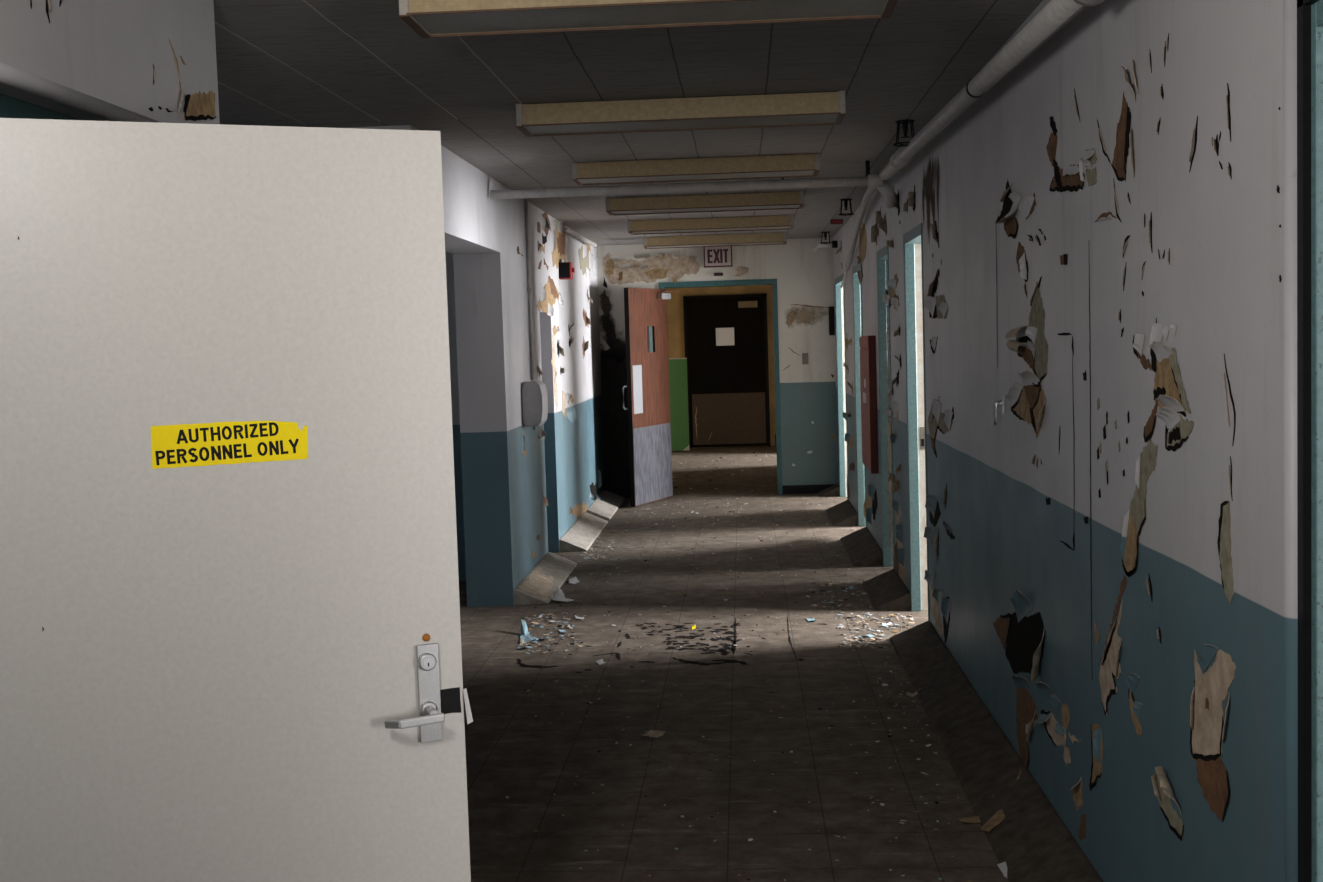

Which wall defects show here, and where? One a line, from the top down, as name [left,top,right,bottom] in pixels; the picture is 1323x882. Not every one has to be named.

spalling [178,89,216,121]
peeling [1111,60,1138,182]
peeling [536,212,700,423]
peeling [924,295,949,319]
peeling [995,116,1085,438]
peeling [927,399,954,458]
peeling [993,318,1194,841]
peeling [1217,501,1234,604]
peeling [1190,644,1236,822]
peeling [958,796,1005,832]